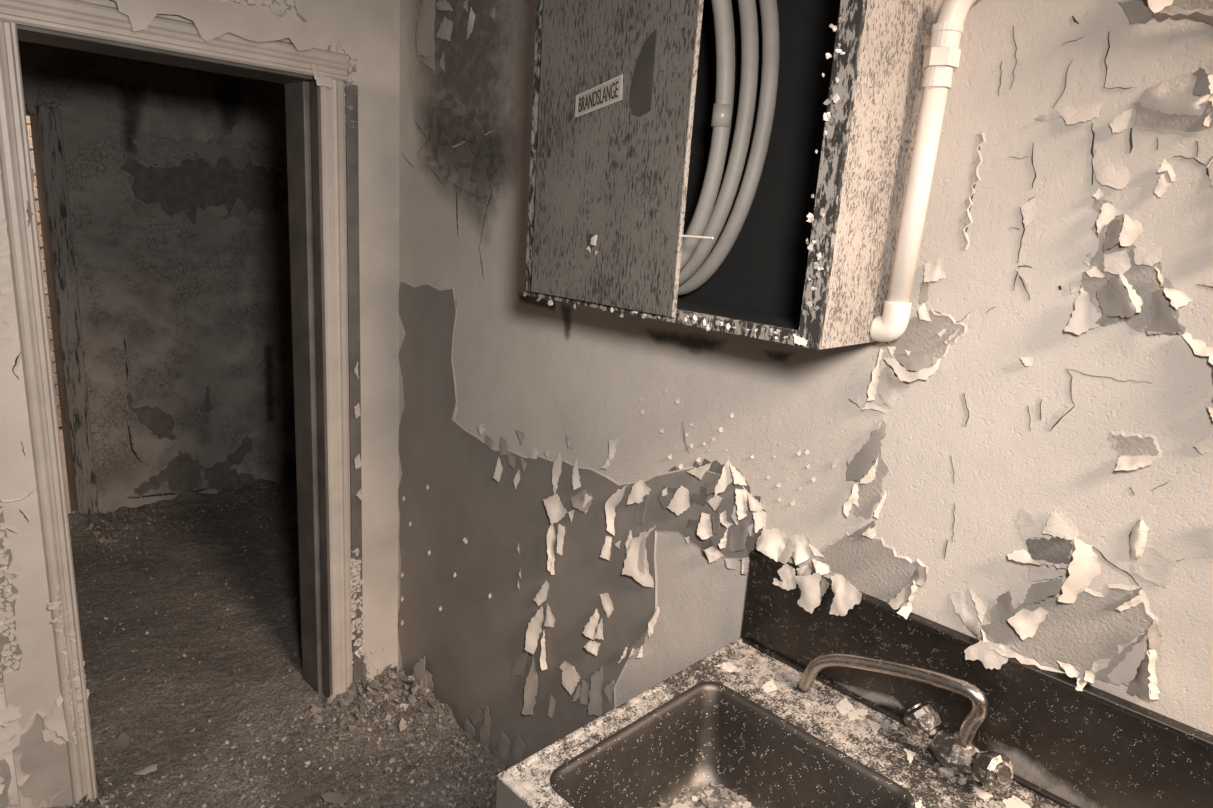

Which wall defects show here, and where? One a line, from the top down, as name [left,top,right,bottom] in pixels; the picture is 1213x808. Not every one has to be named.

peeling [1118,0,1213,26]
crack [997,25,1017,96]
crack [1049,16,1133,110]
flaking render [1131,67,1213,137]
crack [1087,123,1095,186]
crack [1126,128,1213,188]
crack [958,132,1037,314]
peeling [1058,137,1213,365]
peeling [398,255,975,718]
peeling [1108,429,1163,471]
peeling [950,506,1185,700]
peeling [0,585,91,808]